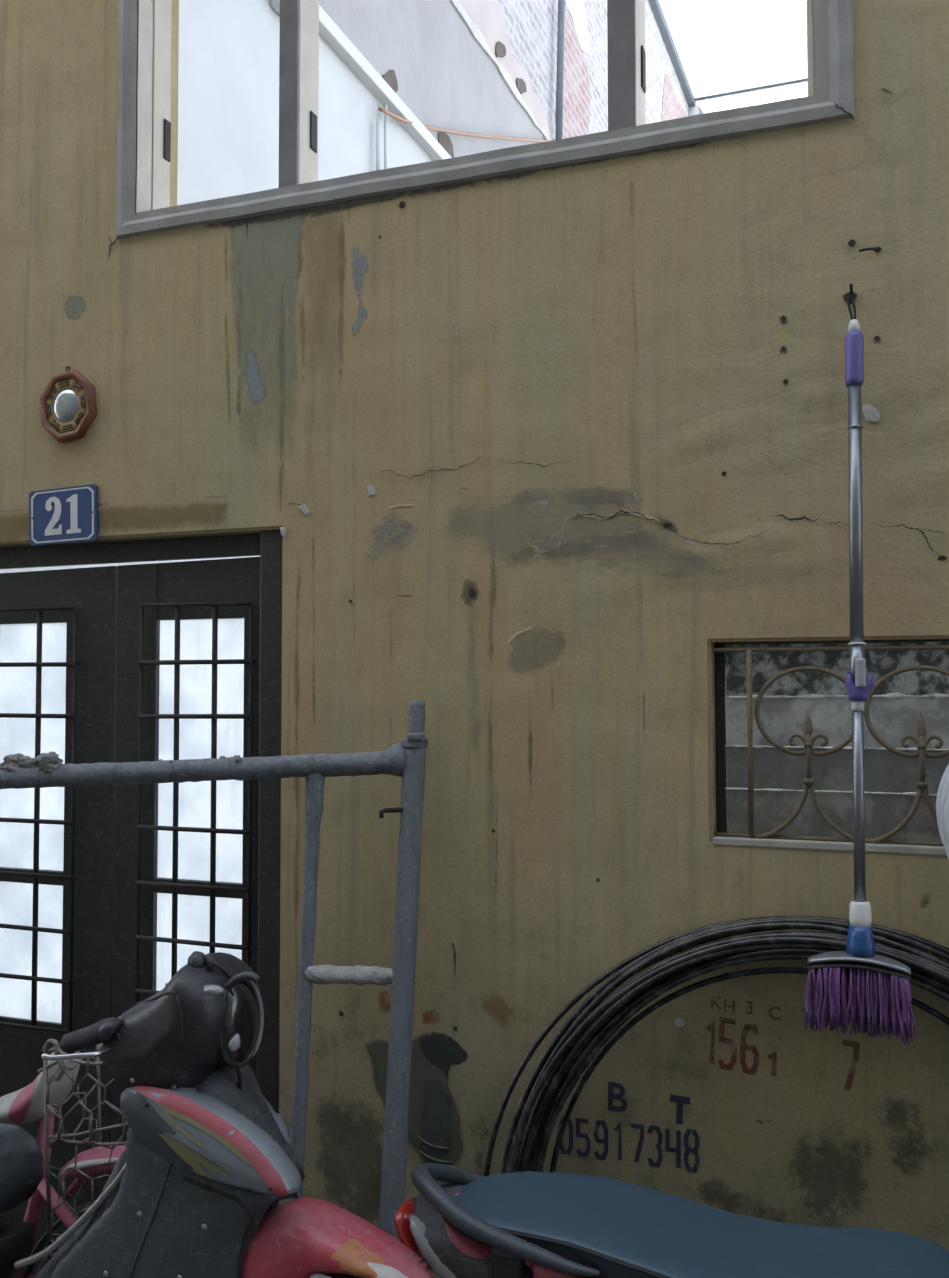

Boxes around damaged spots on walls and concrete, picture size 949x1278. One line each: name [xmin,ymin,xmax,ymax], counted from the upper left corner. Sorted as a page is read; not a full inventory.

damp [228,209,303,384]
peeling [352,248,368,334]
crack [567,510,947,560]